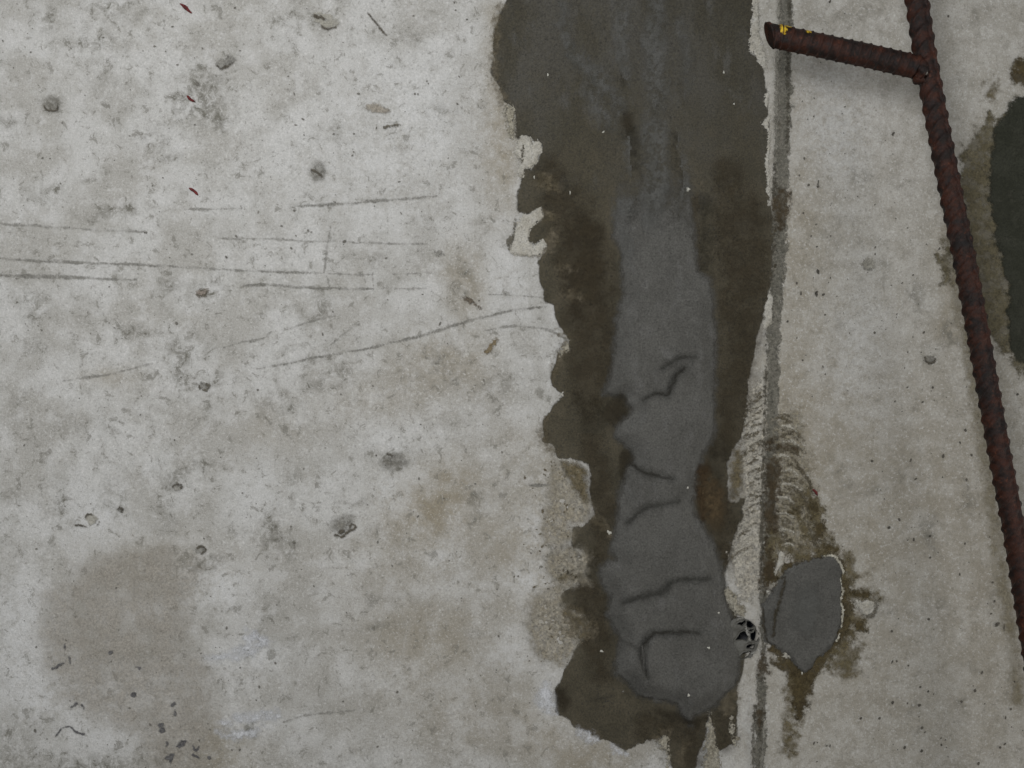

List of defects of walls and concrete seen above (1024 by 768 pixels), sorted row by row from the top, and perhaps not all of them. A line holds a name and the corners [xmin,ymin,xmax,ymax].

water stain [491,0,777,768]
rust [934,239,958,296]
water stain [959,57,1024,374]
water stain [762,488,882,758]